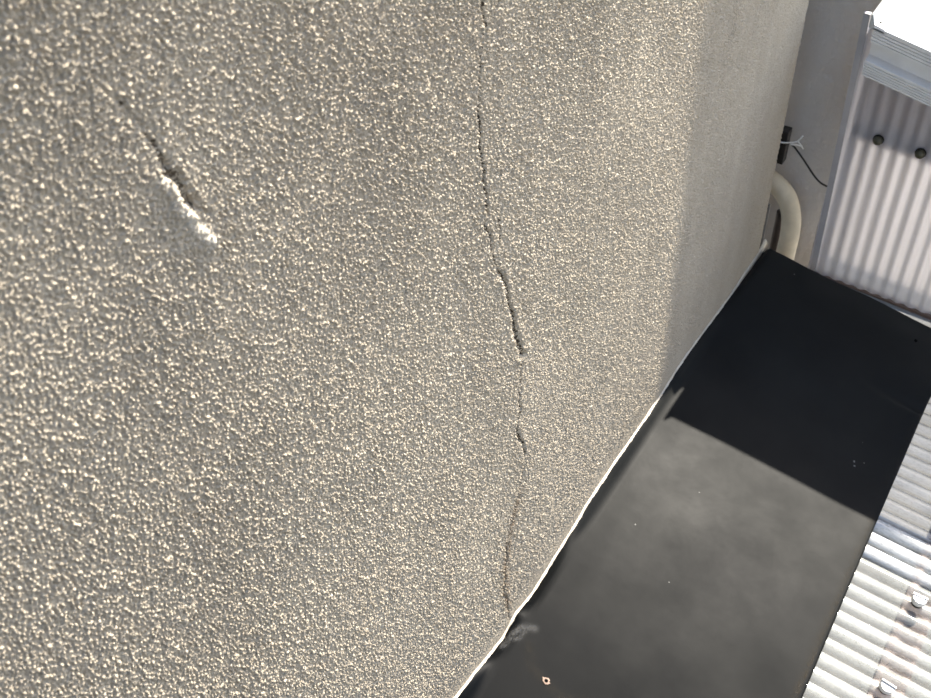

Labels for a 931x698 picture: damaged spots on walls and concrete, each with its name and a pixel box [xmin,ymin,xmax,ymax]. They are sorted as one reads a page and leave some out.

crack [477,1,526,620]